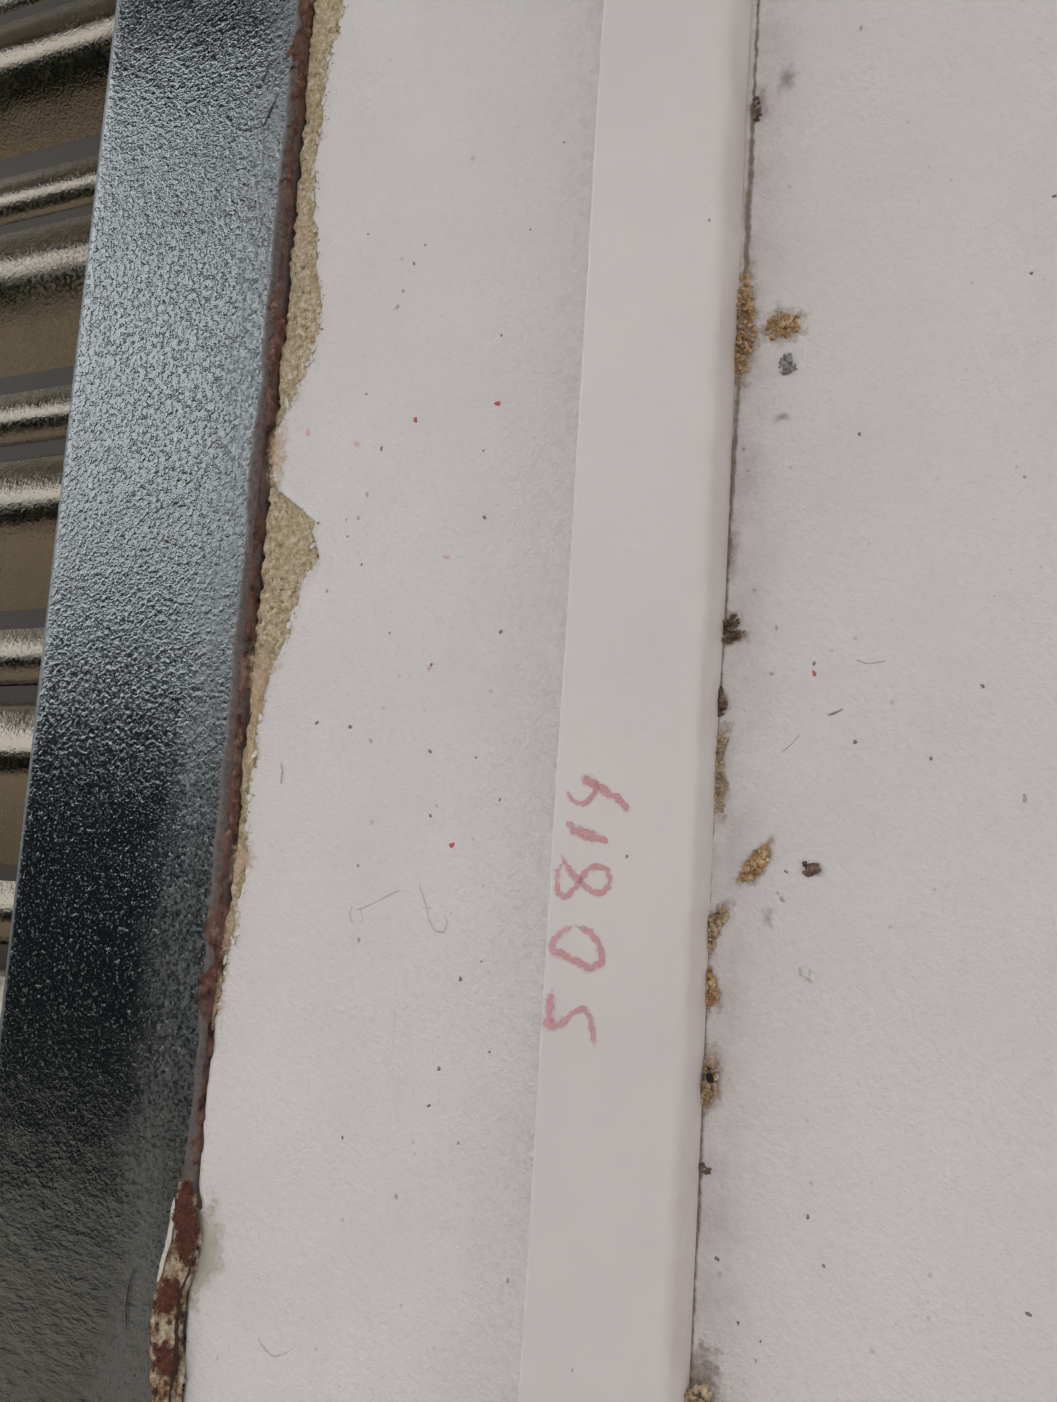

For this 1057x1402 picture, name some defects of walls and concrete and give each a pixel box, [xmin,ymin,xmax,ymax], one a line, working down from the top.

corrosion [156,0,316,1318]
spalling [218,0,349,1006]
corrosion [152,1340,181,1377]